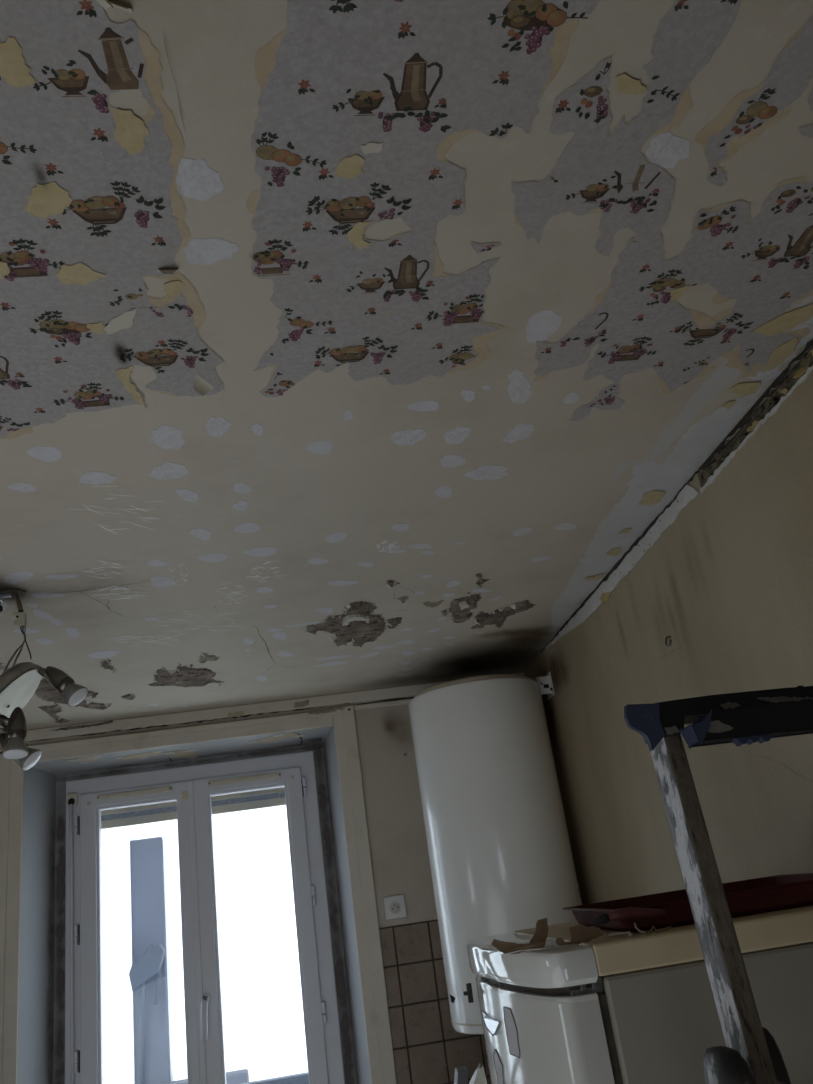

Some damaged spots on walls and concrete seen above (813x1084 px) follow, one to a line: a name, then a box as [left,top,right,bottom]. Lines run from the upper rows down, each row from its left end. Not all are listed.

flaking render [301,601,402,647]
flaking render [423,573,536,630]
flaking render [149,653,224,687]
flaking render [34,679,136,731]